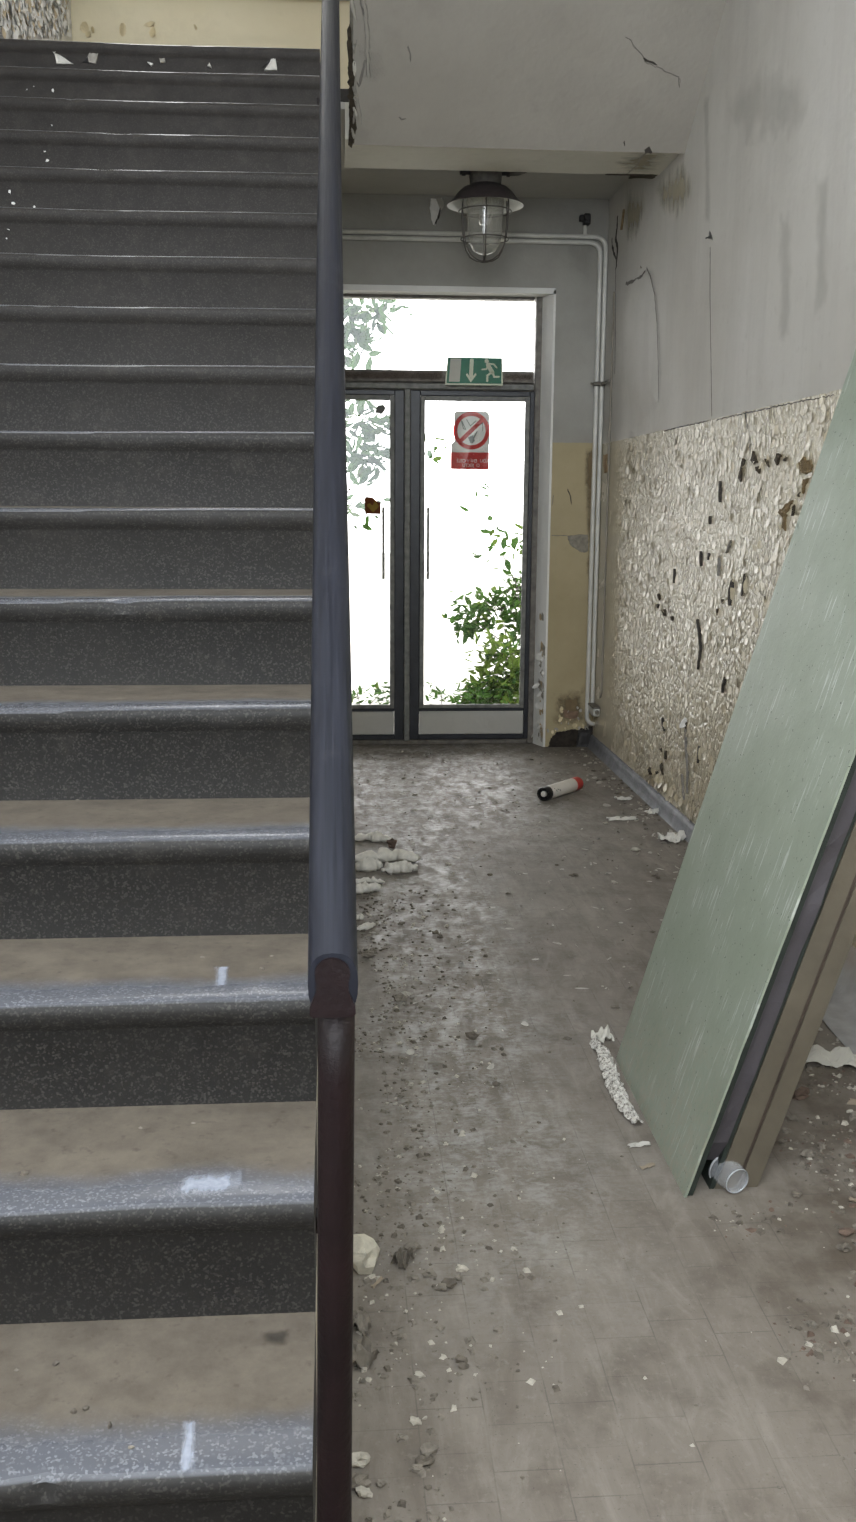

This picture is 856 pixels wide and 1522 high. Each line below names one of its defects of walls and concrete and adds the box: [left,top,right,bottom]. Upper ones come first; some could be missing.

peeling [0,0,98,65]
peeling [262,59,277,71]
crack [625,37,681,83]
peeling [530,392,841,882]